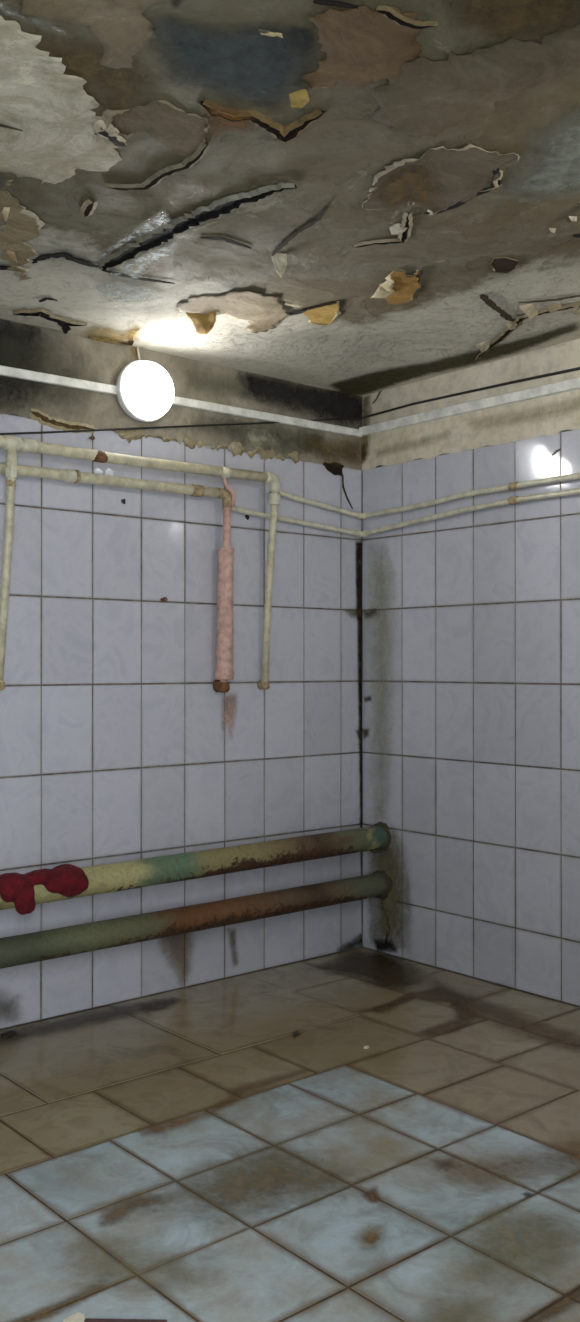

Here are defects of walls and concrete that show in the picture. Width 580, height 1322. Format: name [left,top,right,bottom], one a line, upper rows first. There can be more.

peeling [302,6,580,215]
peeling [0,0,210,280]
peeling [272,253,287,278]
peeling [371,269,423,305]
peeling [491,257,518,273]
peeling [176,291,341,335]